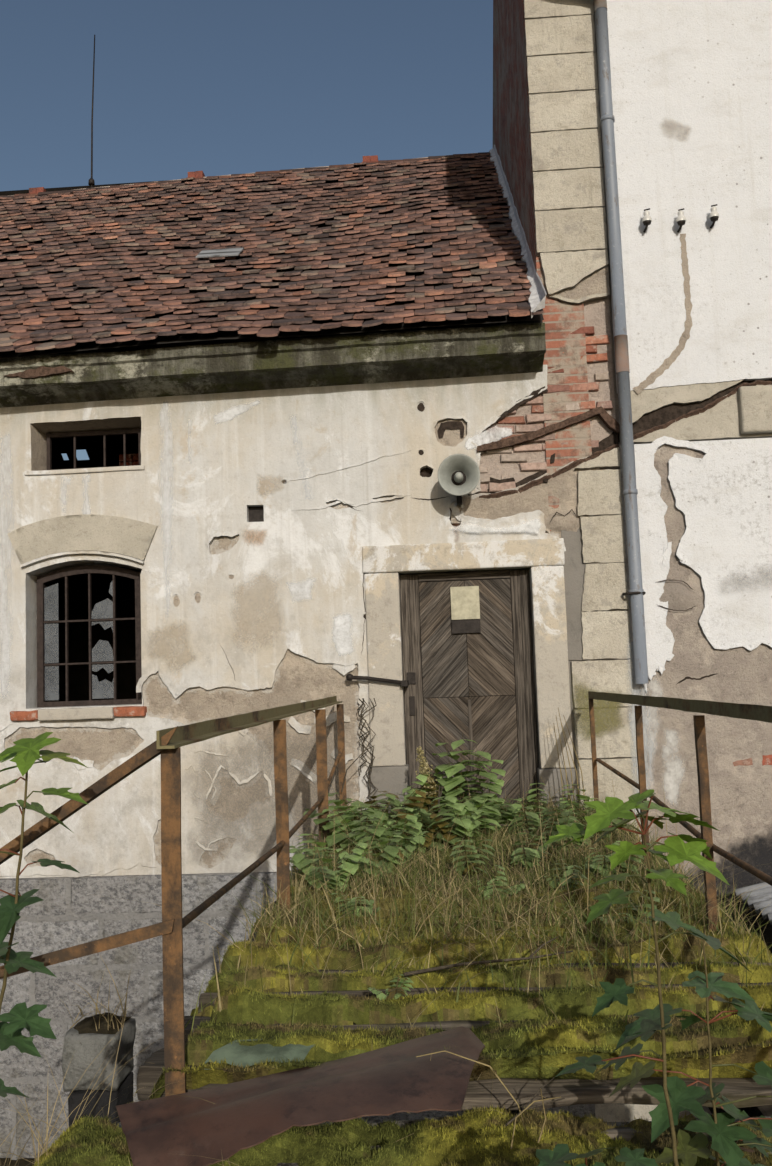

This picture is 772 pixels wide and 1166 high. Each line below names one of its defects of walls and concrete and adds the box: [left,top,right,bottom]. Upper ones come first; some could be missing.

spalling [417,448,436,477]
crack [279,379,772,511]
flaking render [430,262,633,649]
peeling [203,529,245,554]
peeling [633,436,772,886]
peeling [0,642,367,878]
leakage [687,835,772,934]